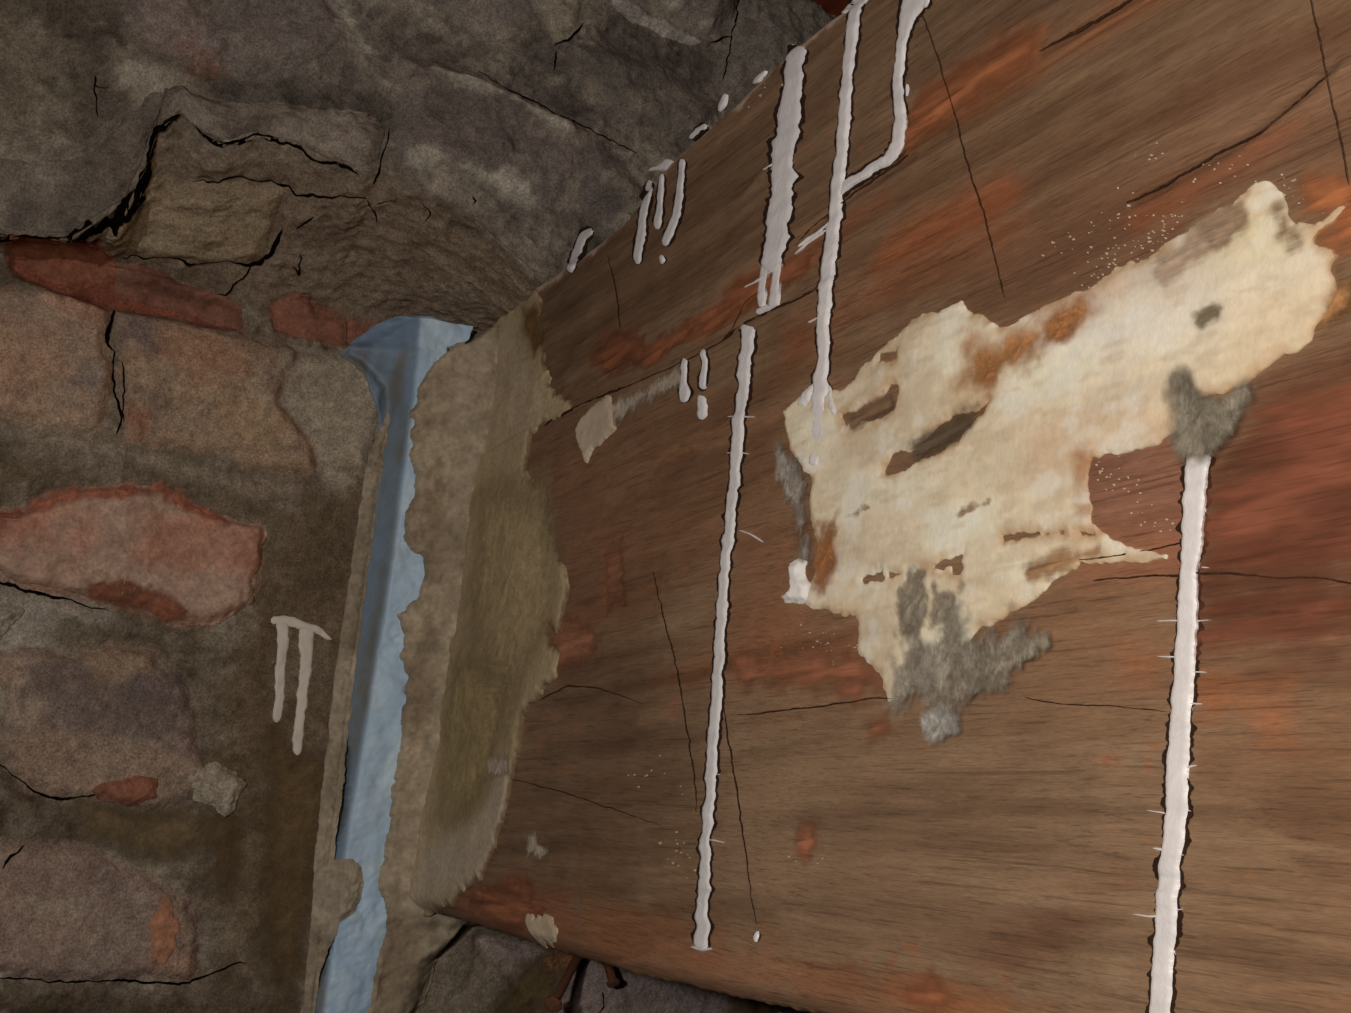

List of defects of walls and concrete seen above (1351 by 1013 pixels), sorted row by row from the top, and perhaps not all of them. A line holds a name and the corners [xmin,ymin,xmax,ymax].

crack [1039,0,1131,51]
leakage [753,70,768,84]
crack [1126,0,1349,203]
crack [0,114,431,296]
corrosion [590,254,808,372]
leakage [756,262,783,315]
leakage [974,298,1087,387]
leakage [813,523,836,592]
leakage [271,615,332,640]
crack [2,844,25,869]
peeling [525,914,558,948]
crack [0,962,248,985]